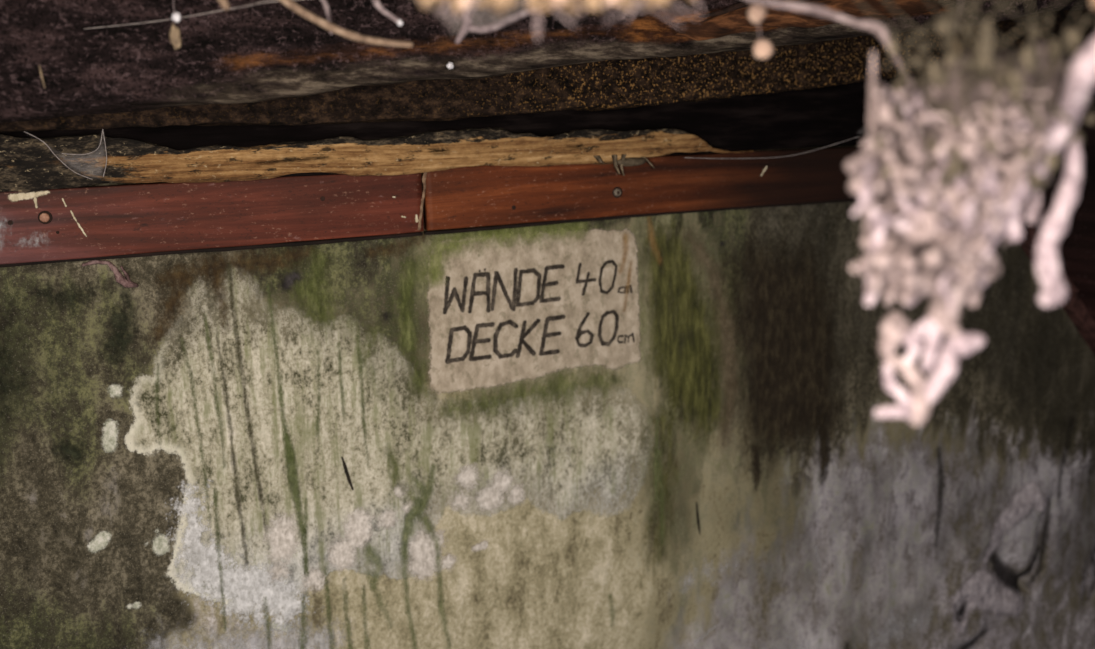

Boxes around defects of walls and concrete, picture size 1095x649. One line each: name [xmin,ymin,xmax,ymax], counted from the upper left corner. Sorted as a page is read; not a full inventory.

water stain [199,249,314,369]
water stain [357,335,365,432]
water stain [700,237,839,489]
water stain [165,378,456,649]
water stain [452,464,524,510]
water stain [1028,505,1050,586]